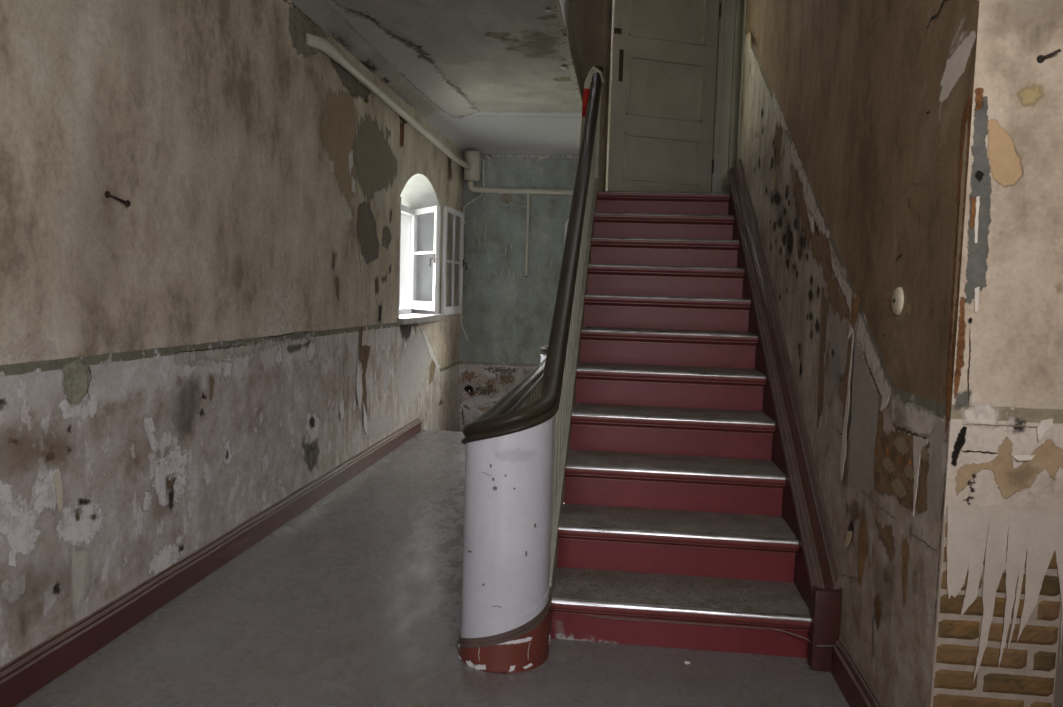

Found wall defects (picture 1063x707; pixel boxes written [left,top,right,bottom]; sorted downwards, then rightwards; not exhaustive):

crack [346,8,476,117]
peeling [772,92,830,239]
peeling [988,120,1024,188]
leakage [765,186,819,339]
peeling [174,331,316,378]
peeling [831,253,934,439]
spalling [59,395,99,426]
flaking render [142,416,189,511]
peeling [458,384,502,428]
flaking render [962,403,1054,442]
peeling [0,467,105,618]
peeling [148,543,184,575]